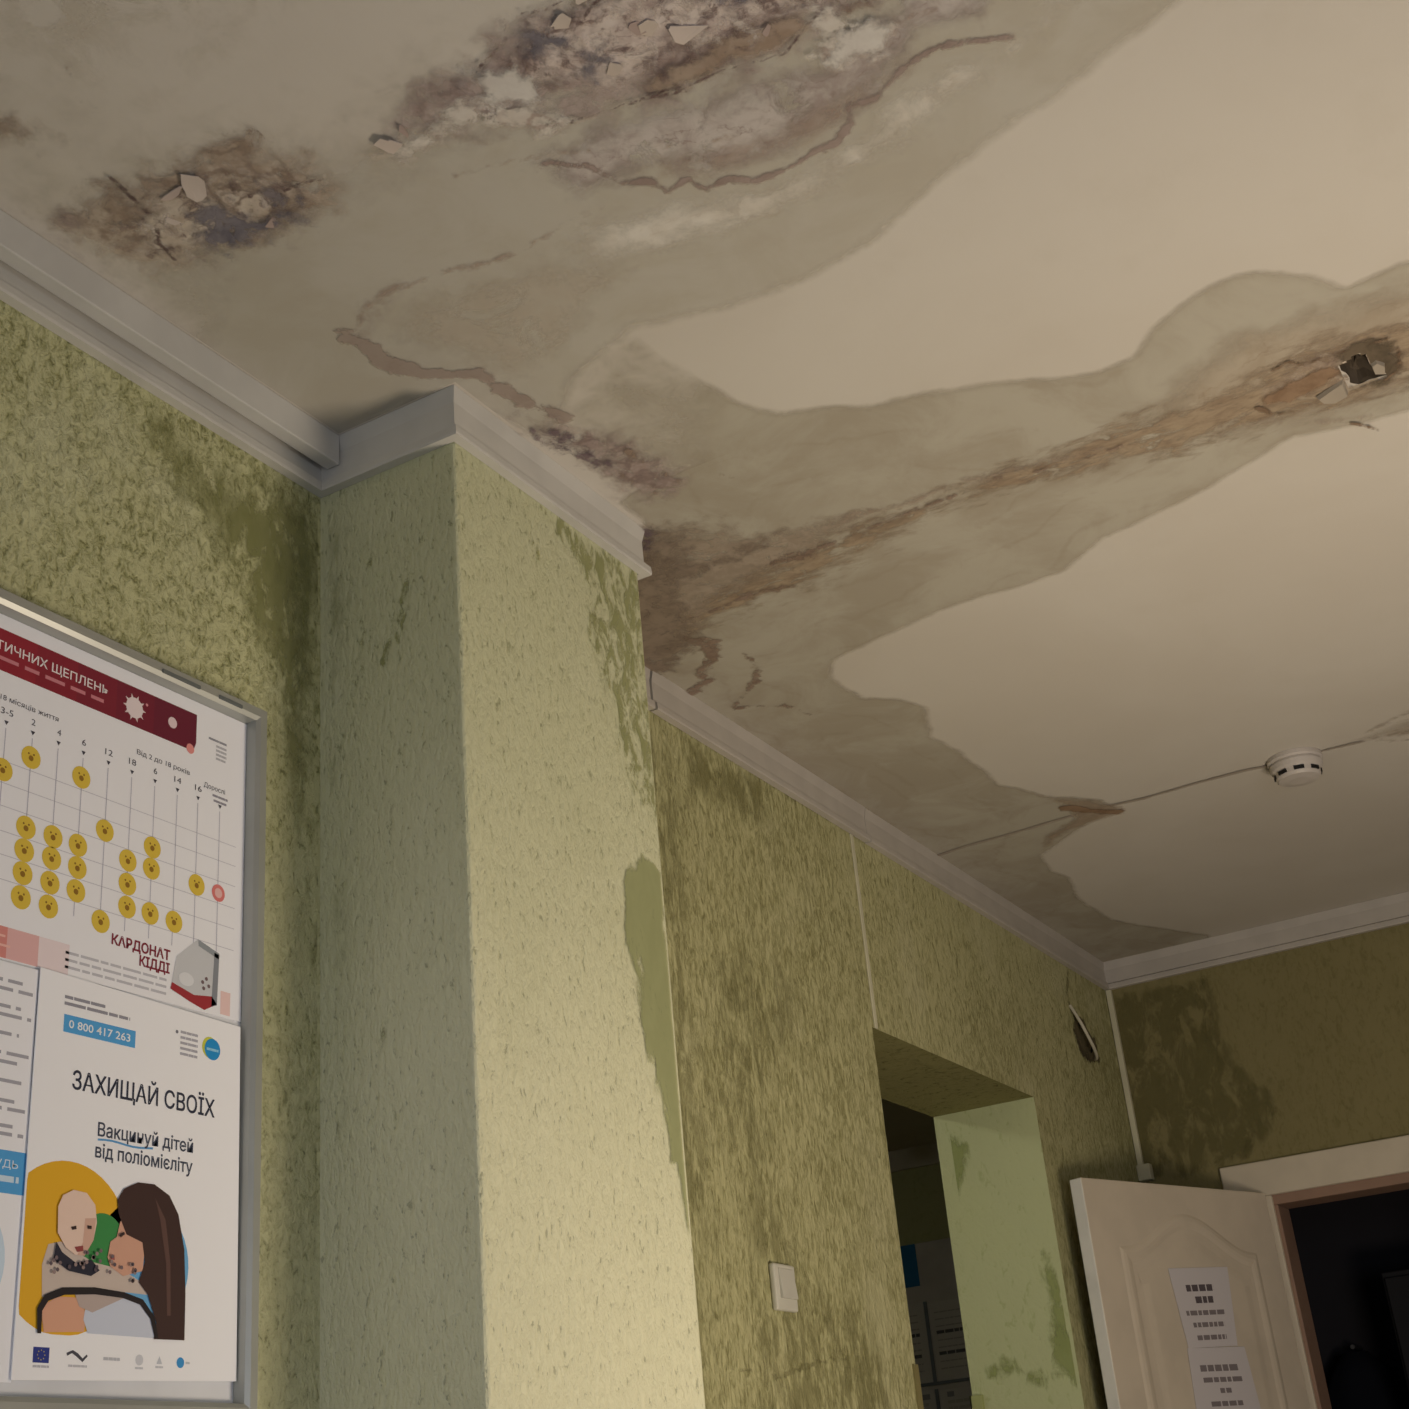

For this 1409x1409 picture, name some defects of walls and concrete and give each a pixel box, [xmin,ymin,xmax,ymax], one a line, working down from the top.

peeling [373,0,896,163]
peeling [57,130,333,265]
spalling [1167,298,1409,431]
leakage [153,0,1409,962]
leakage [625,855,690,1233]
leakage [1117,980,1272,1176]